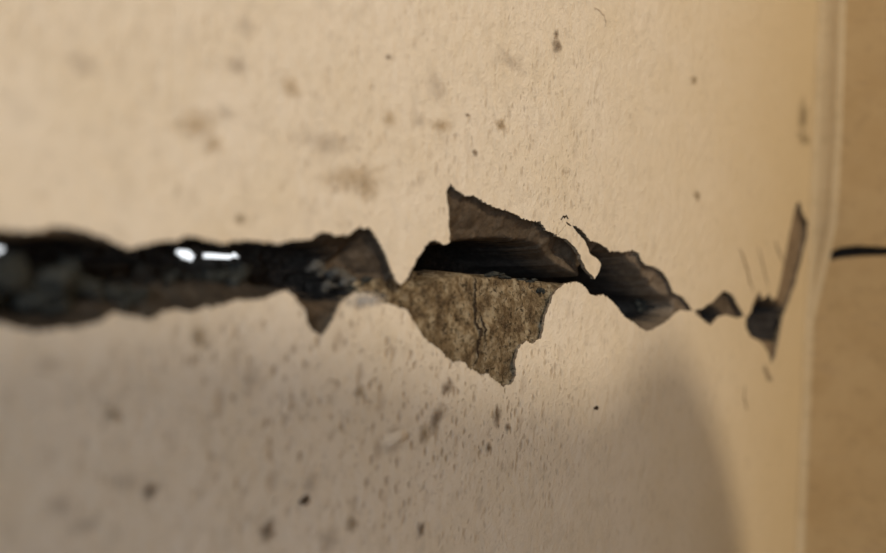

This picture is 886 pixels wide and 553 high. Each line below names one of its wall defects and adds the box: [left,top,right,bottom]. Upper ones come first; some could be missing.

crack [0,236,353,303]
flaking render [0,186,741,386]
crack [412,241,559,282]
crack [739,203,807,381]